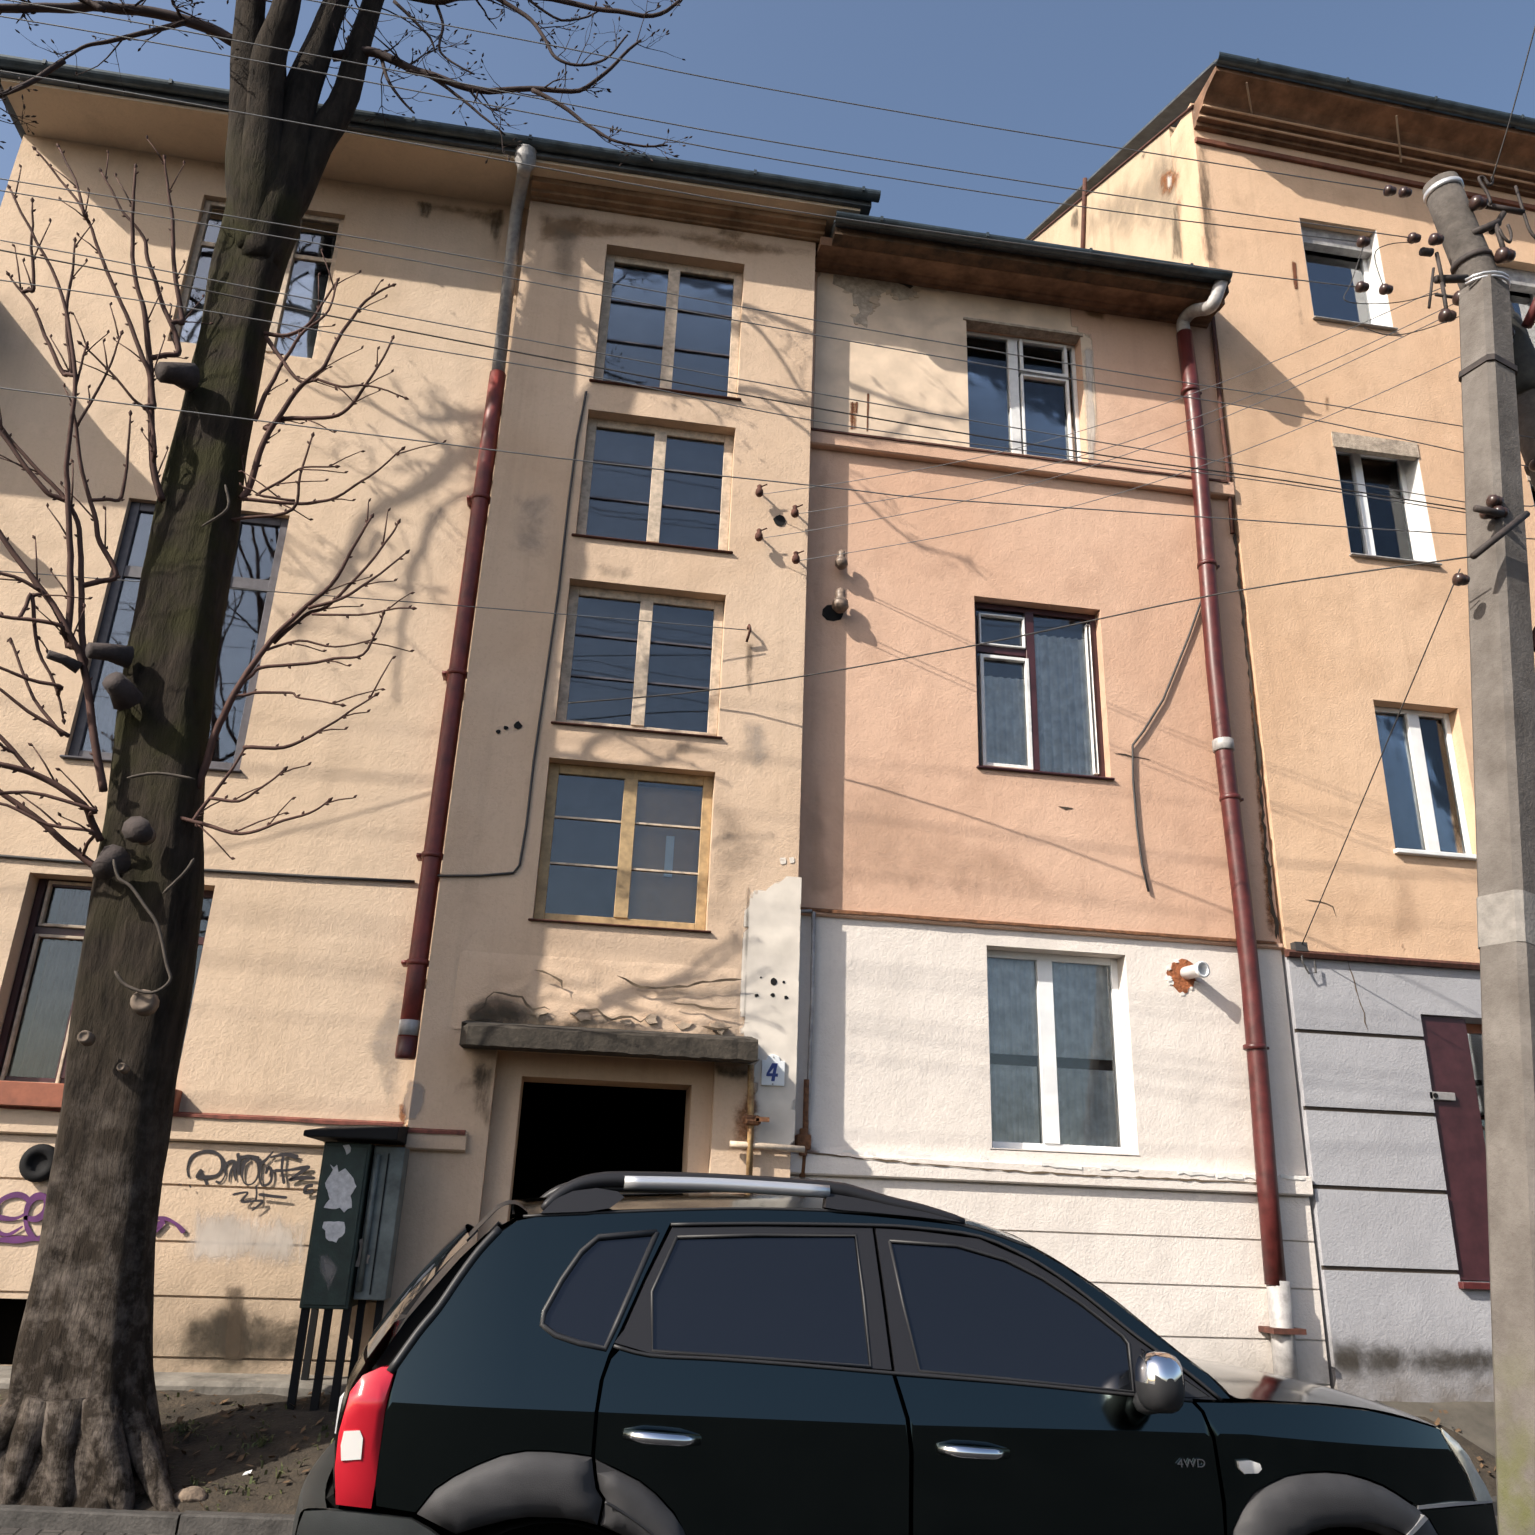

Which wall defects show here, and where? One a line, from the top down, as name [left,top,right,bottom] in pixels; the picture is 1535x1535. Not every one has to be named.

damp [544,218,655,238]
corrosion [736,1100,757,1139]
damp [188,1289,296,1359]